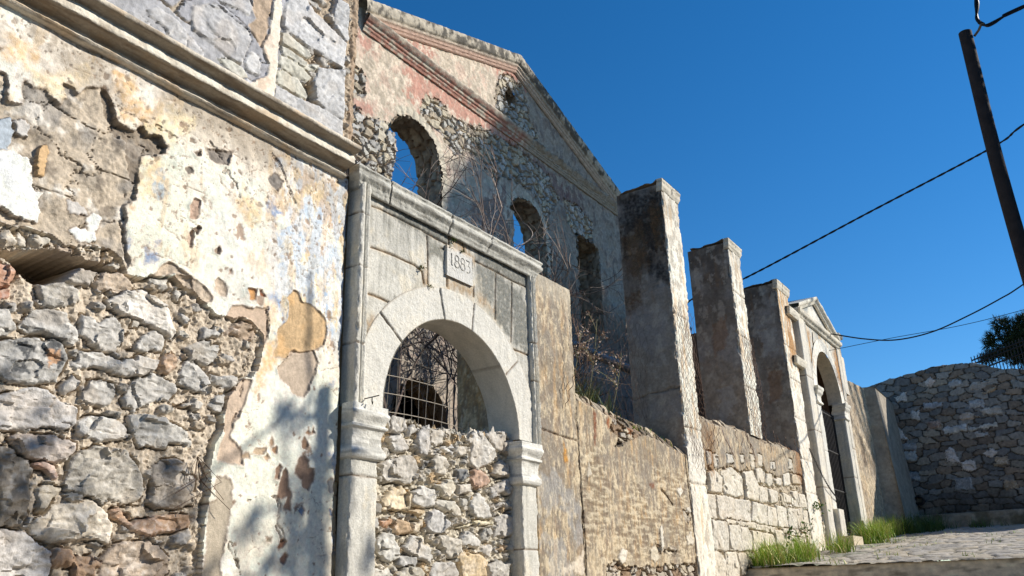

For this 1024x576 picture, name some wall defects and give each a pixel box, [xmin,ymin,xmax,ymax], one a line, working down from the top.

spalling [0,70,334,576]
spalling [609,419,638,447]